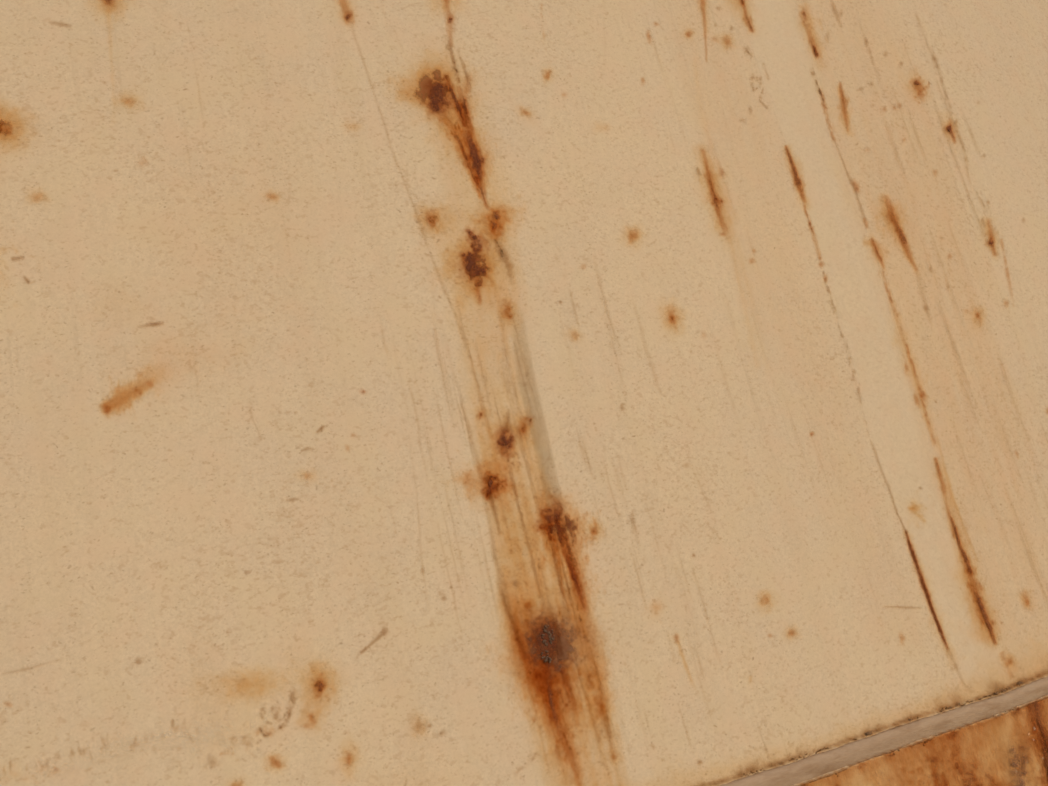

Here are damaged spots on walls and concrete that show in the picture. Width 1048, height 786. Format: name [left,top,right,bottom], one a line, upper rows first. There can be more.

rust [416,70,467,114]
rust [464,231,488,286]
rust [549,515,577,547]